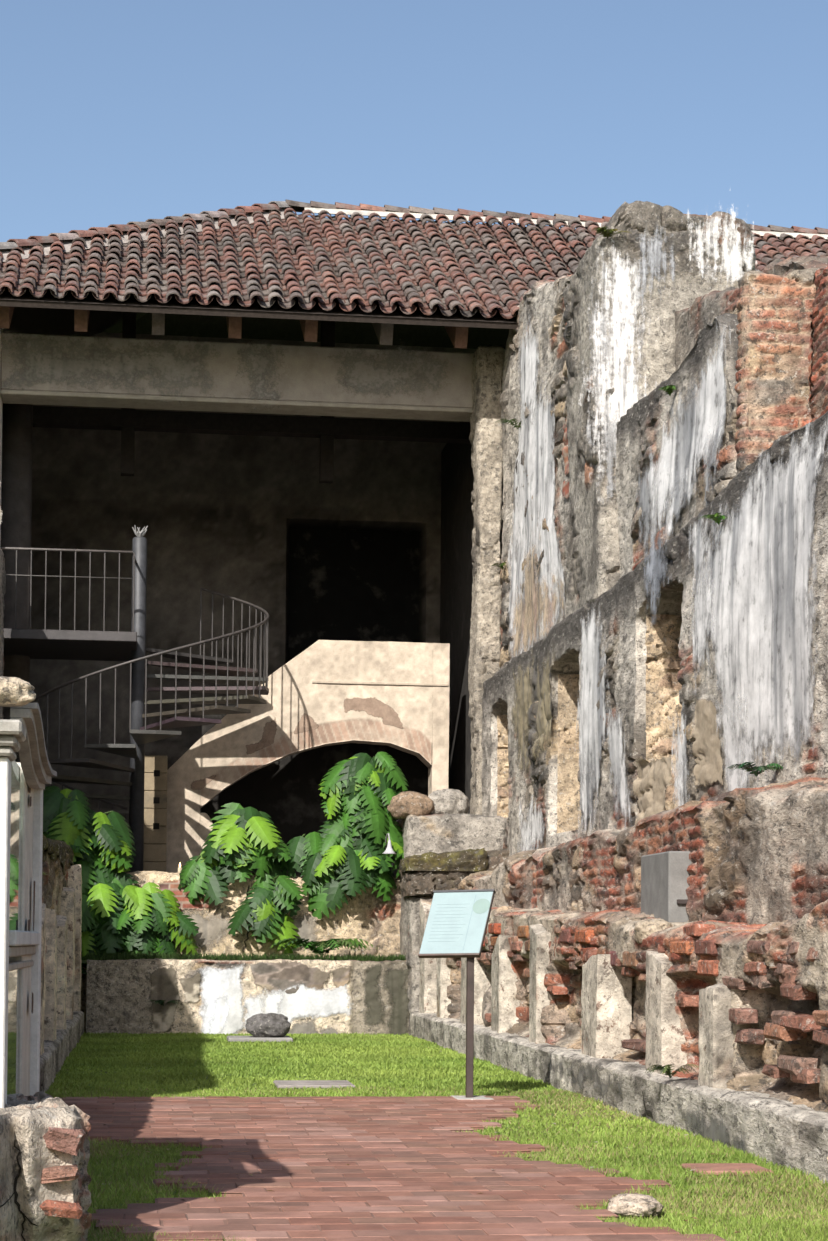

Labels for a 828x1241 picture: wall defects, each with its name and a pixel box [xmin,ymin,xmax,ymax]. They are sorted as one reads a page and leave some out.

leakage [587,229,674,495]
leakage [508,325,565,776]
leakage [638,329,828,791]
leakage [577,611,630,829]
leakage [672,715,689,806]
crack [0,1140,38,1241]